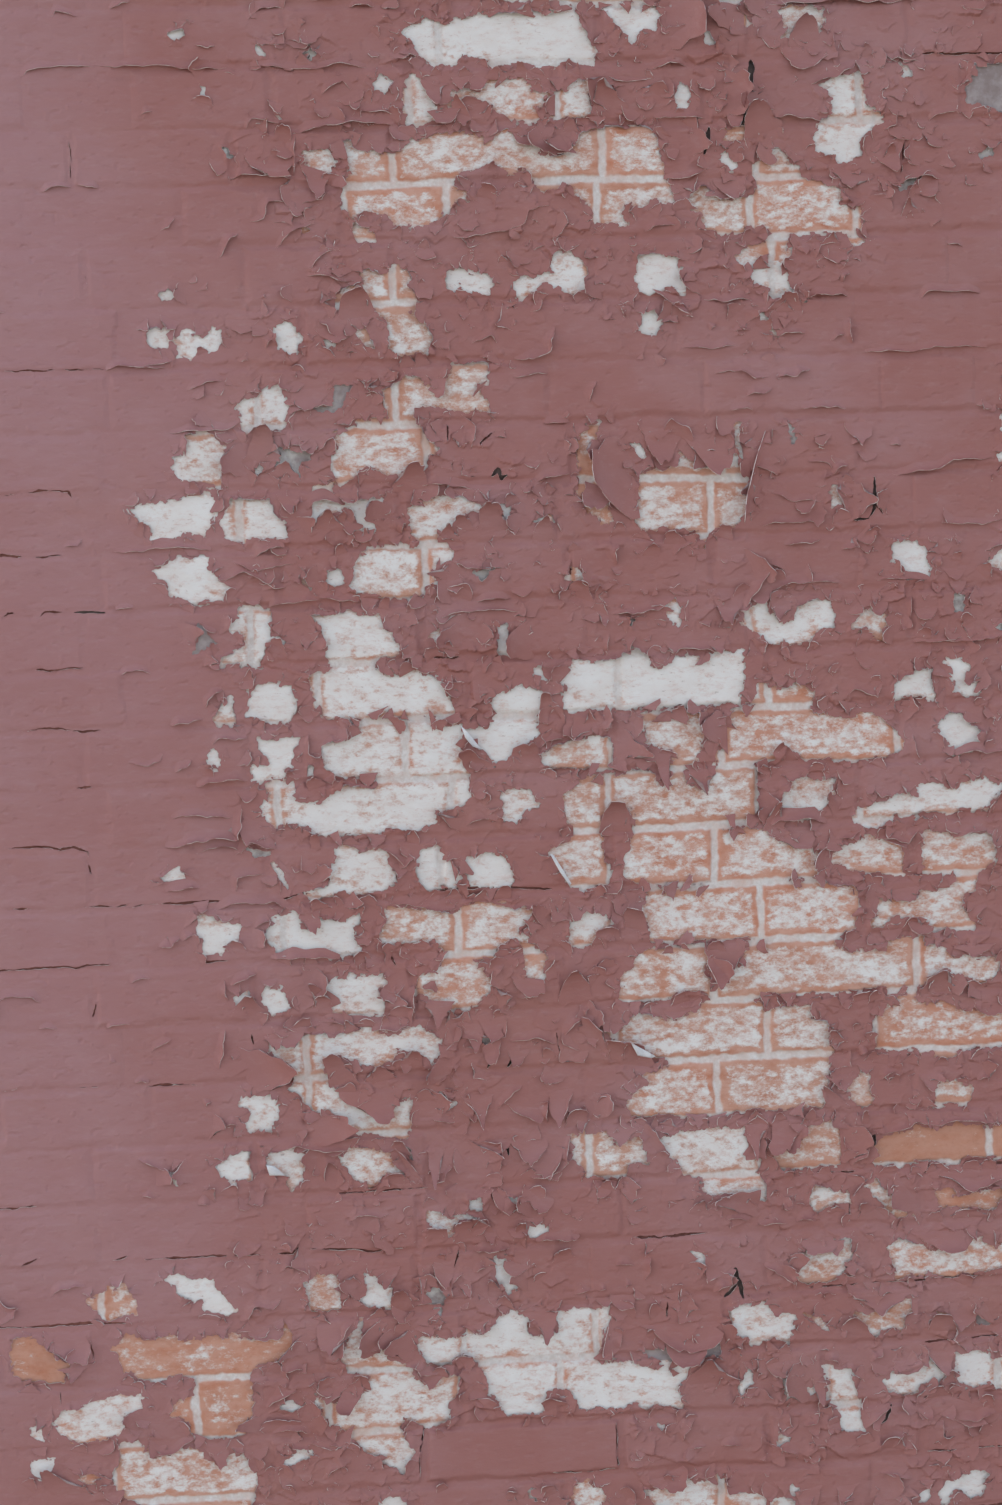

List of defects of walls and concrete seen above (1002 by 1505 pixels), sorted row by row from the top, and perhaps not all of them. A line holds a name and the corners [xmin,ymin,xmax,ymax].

peeling [167,21,187,47]
peeling [960,52,1002,120]
peeling [443,236,701,341]
peeling [122,257,1002,1485]